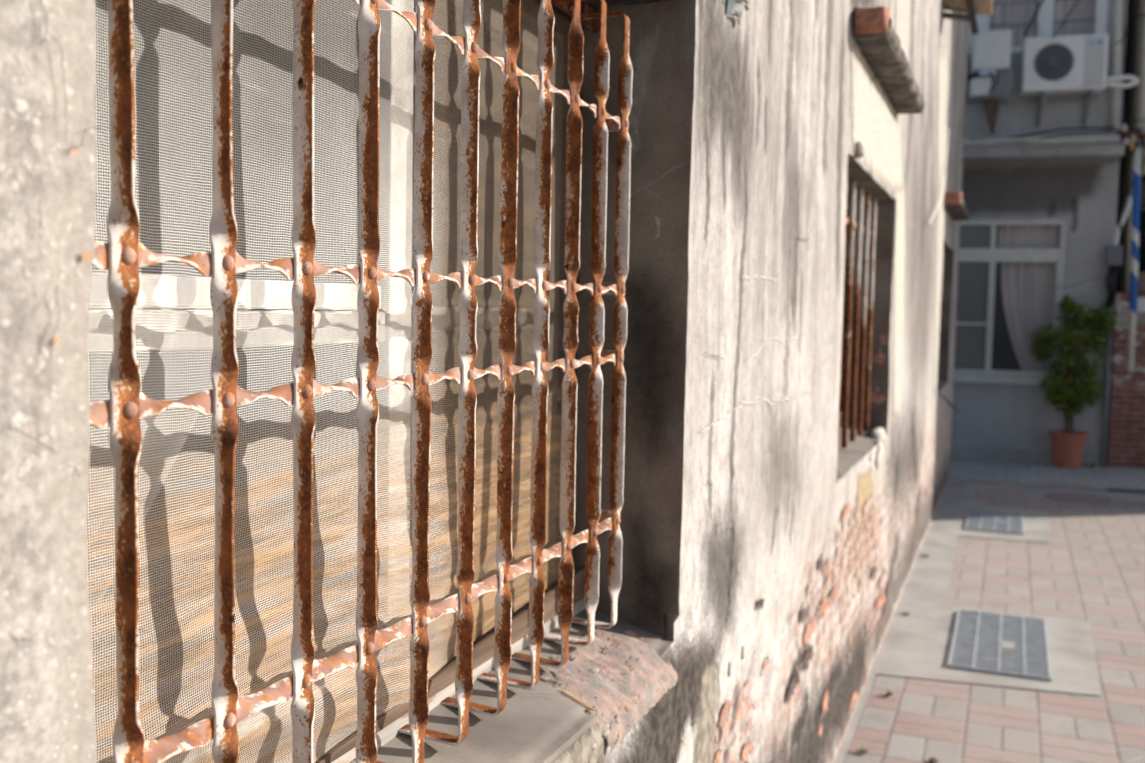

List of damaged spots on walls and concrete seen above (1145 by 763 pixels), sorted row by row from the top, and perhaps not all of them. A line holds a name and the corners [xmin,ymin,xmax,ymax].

spalling [722,0,749,28]
water stain [816,0,844,195]
spalling [786,482,910,703]
spalling [532,629,678,754]
spalling [714,643,772,763]
spalling [817,689,829,737]